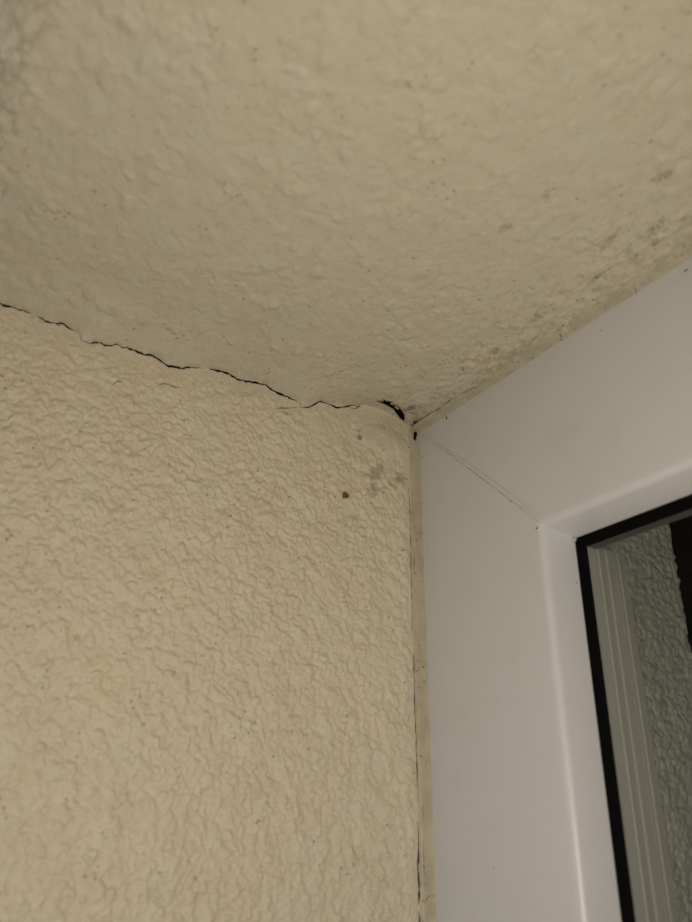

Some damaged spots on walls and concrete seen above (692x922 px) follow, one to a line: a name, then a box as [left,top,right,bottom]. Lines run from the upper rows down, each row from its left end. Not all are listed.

crack [0,303,384,416]